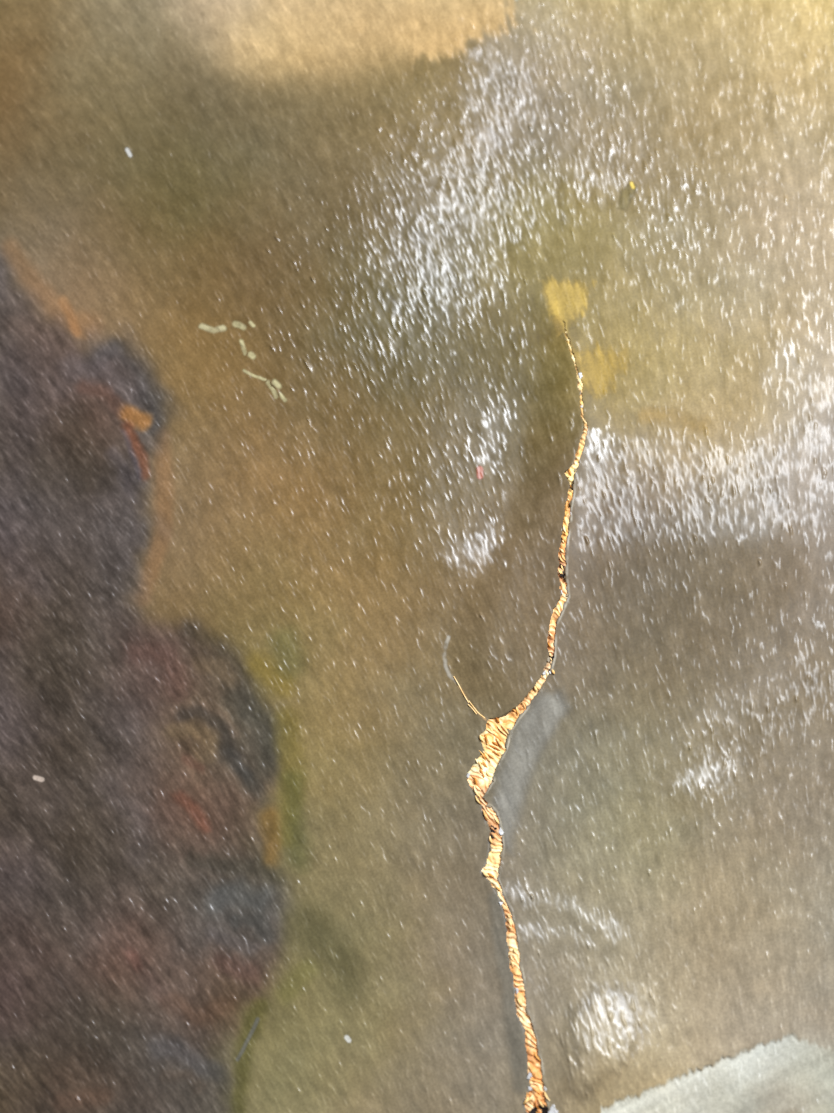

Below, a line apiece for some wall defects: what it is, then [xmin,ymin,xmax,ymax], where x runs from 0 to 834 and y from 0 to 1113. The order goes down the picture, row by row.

water stain [545,279,588,333]
water stain [575,348,626,394]
crack [444,322,588,1113]